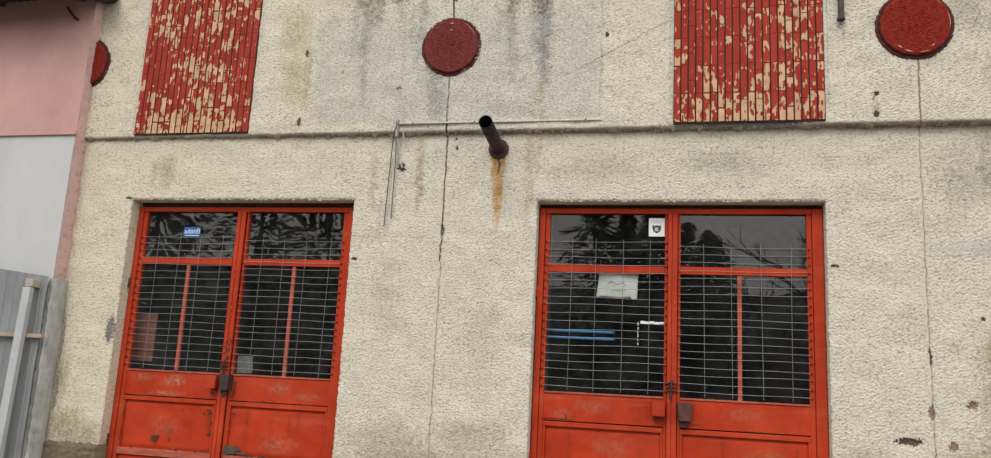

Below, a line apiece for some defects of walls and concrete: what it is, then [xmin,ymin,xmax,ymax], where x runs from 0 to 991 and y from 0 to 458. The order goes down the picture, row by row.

peeling [134,0,260,134]
peeling [674,0,825,122]
crack [915,60,923,123]
crack [439,77,450,269]
corrosion [492,159,502,211]
spalling [893,438,922,447]